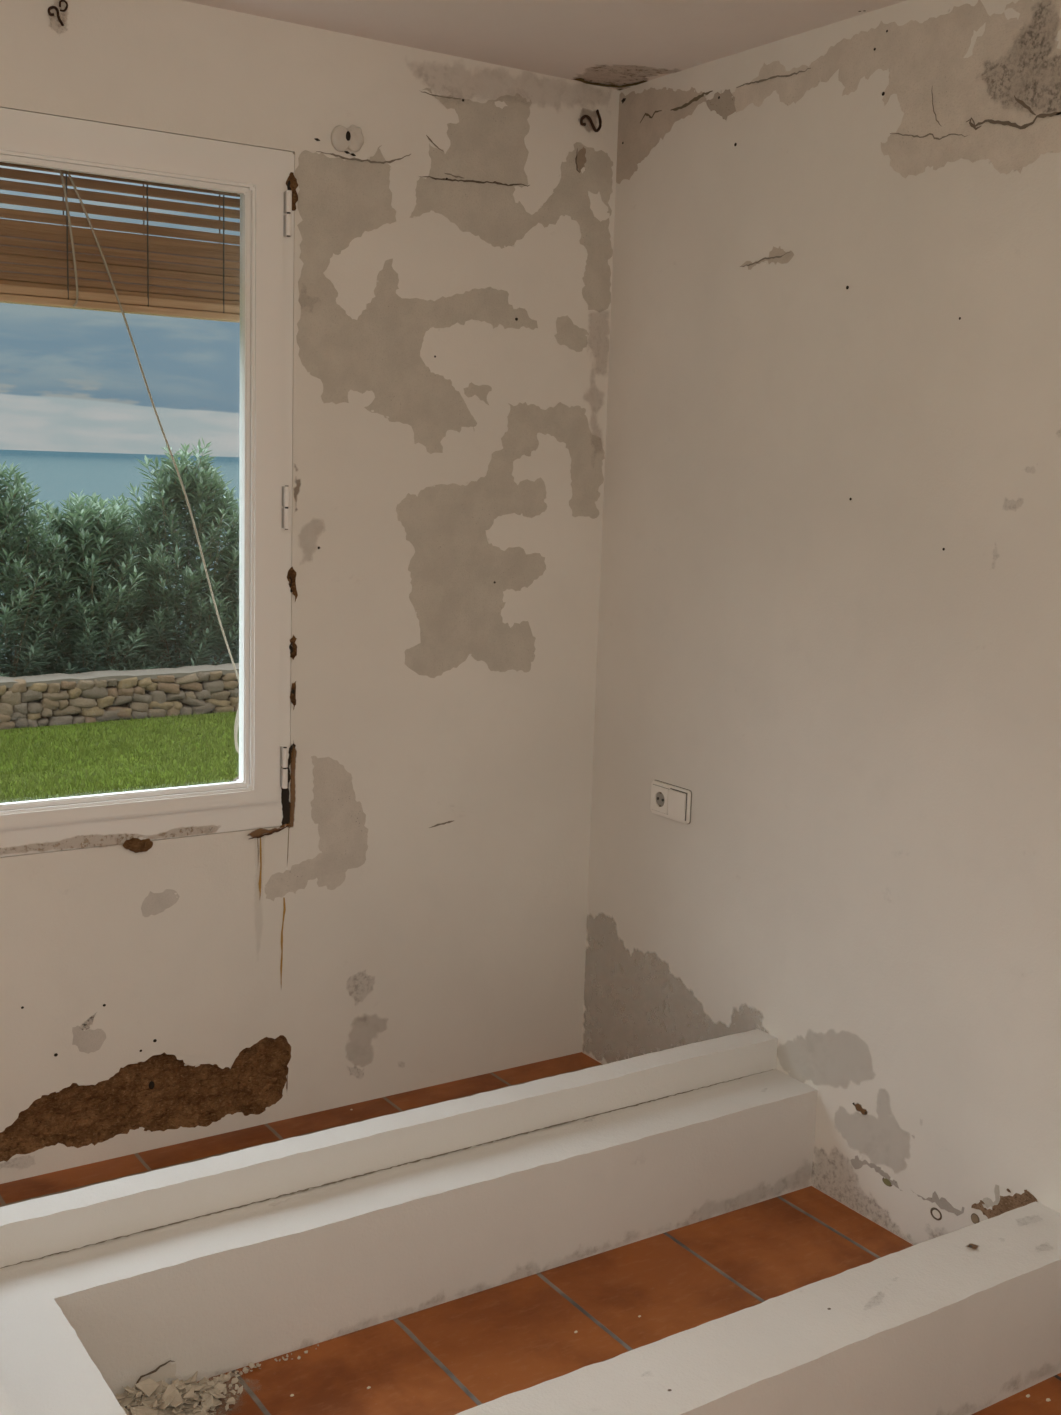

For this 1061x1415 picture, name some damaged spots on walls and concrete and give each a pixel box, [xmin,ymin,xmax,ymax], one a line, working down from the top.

damp [990,4,1061,112]
crack [890,85,1061,140]
peeling [286,0,1061,454]
peeling [396,402,605,678]
spalling [287,566,298,601]
spalling [289,634,297,660]
peeling [264,739,368,901]
corrosion [248,823,291,895]
peeling [72,1016,106,1054]
spalling [0,1035,291,1162]
spalling [850,1156,1037,1219]